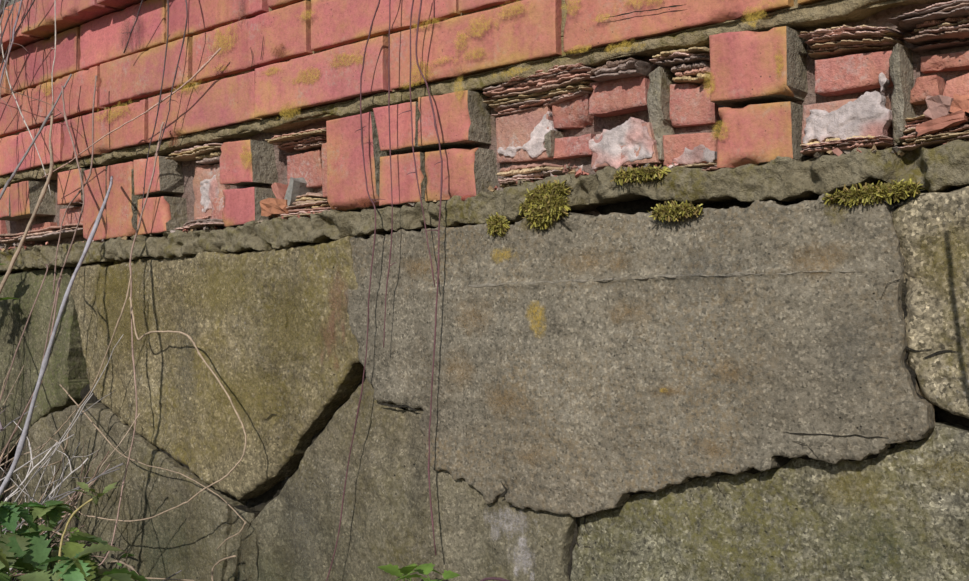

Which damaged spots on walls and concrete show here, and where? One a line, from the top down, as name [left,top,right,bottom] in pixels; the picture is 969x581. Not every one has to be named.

leakage [802,72,893,144]
spalling [166,143,222,165]
spalling [266,128,327,152]
leakage [497,111,558,158]
leakage [589,117,657,170]
leakage [673,144,717,166]
spalling [800,115,969,157]
spalling [278,192,340,218]
crack [881,278,907,319]
crack [377,403,420,412]
crack [628,345,969,498]
crack [567,510,606,579]